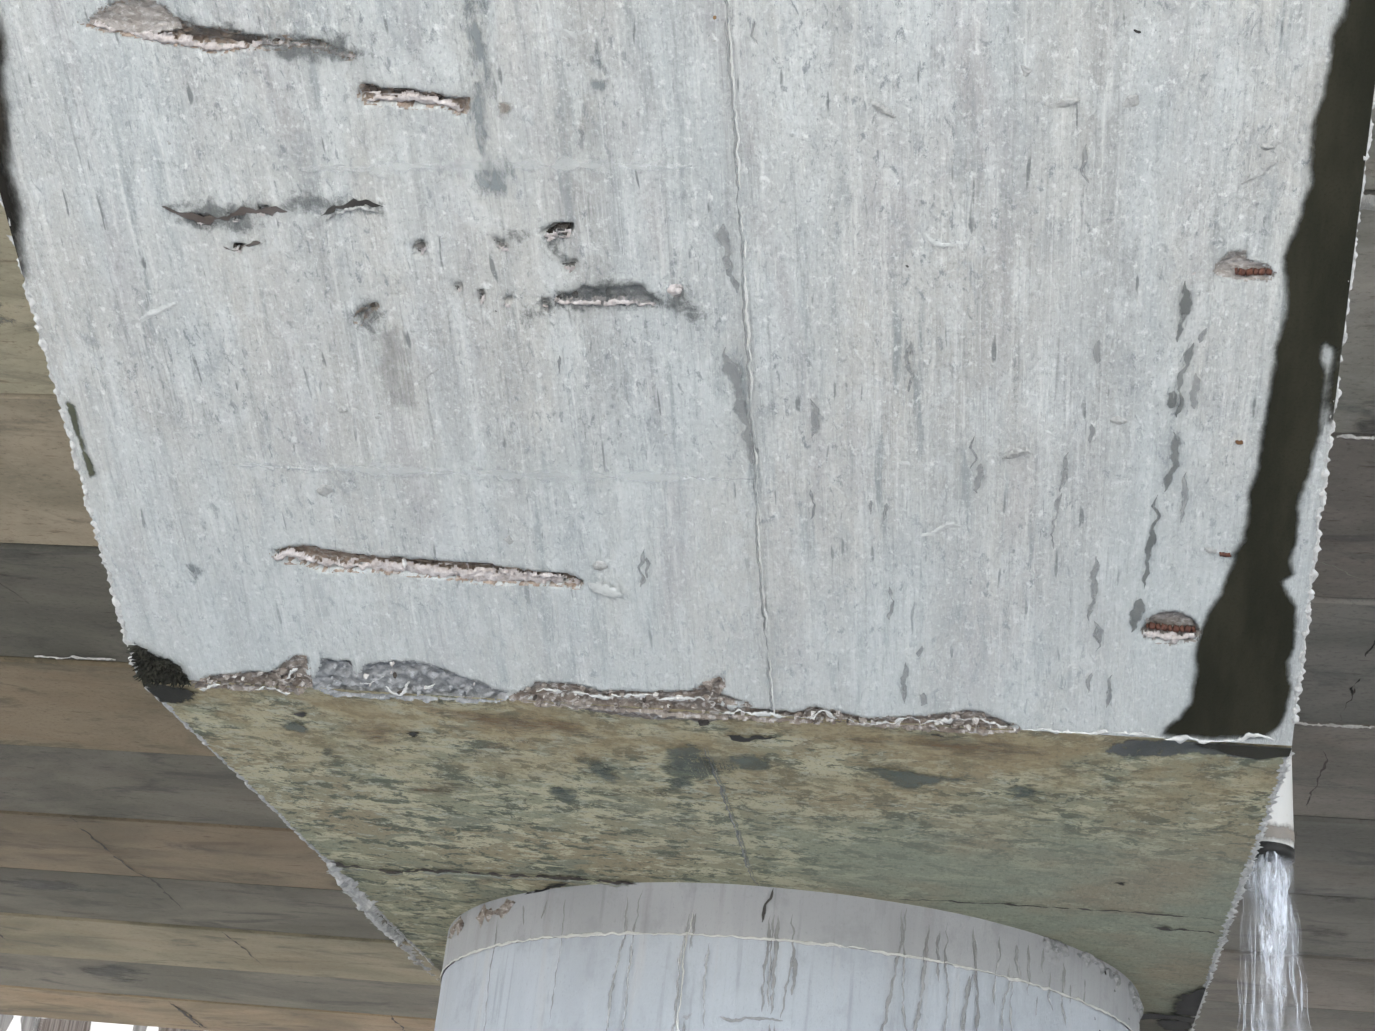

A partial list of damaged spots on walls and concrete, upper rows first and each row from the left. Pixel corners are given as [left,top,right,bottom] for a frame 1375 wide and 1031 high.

spalling [77,0,362,62]
spalling [357,84,471,116]
spalling [544,222,576,273]
spalling [526,280,698,321]
leakage [1020,0,1375,760]
leakage [810,399,819,438]
leakage [969,436,983,493]
spalling [269,545,623,599]
leakage [638,549,650,587]
spalling [191,655,1022,736]
leakage [901,646,927,706]
leakage [606,897,639,1031]